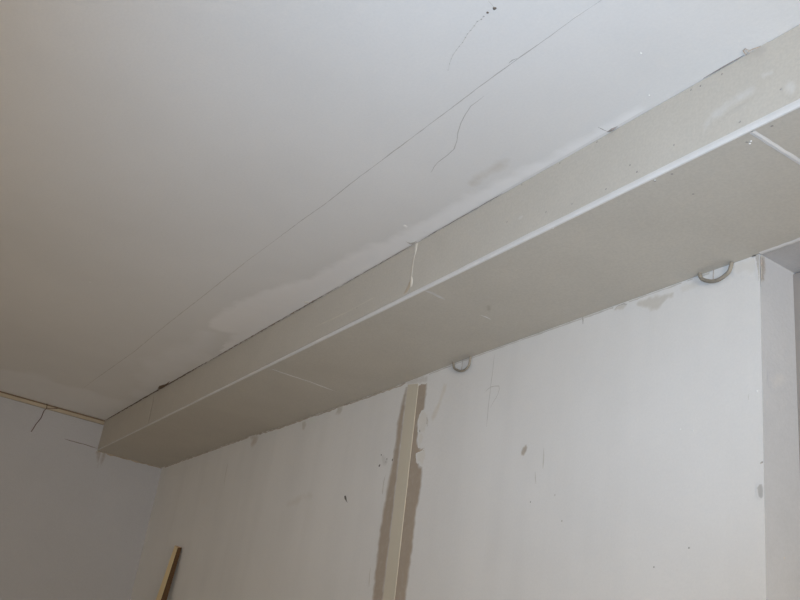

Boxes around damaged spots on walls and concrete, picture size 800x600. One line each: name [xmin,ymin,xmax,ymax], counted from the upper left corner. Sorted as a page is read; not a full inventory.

crack [85,0,601,420]
spalling [613,288,677,314]